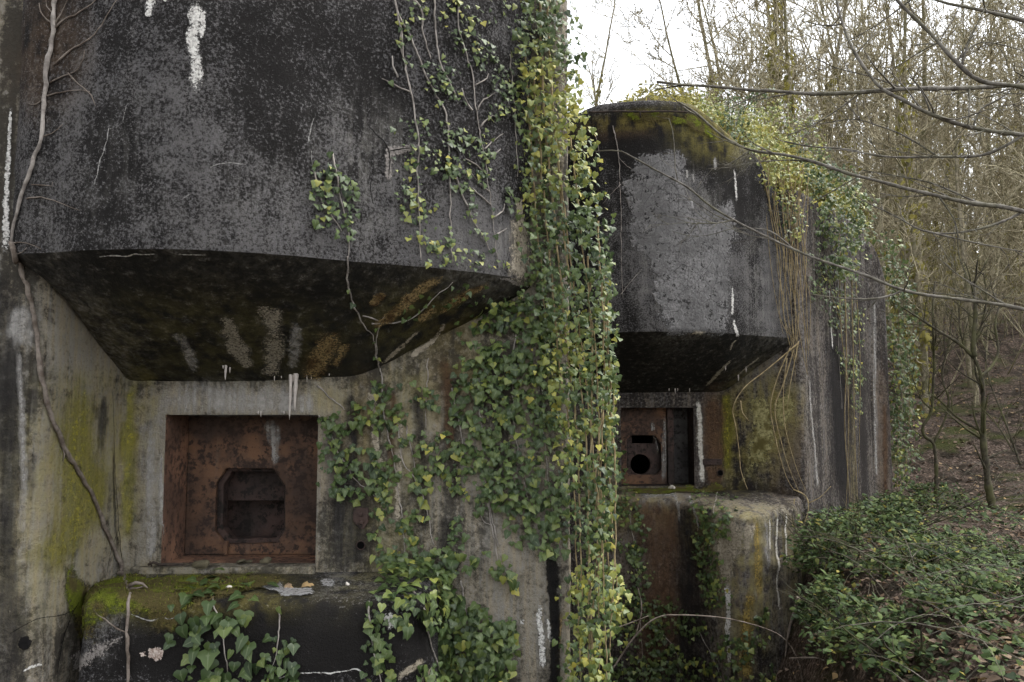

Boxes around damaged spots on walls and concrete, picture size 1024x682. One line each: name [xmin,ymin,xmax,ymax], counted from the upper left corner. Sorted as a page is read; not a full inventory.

leakage [827,328,850,487]
leakage [714,516,787,662]